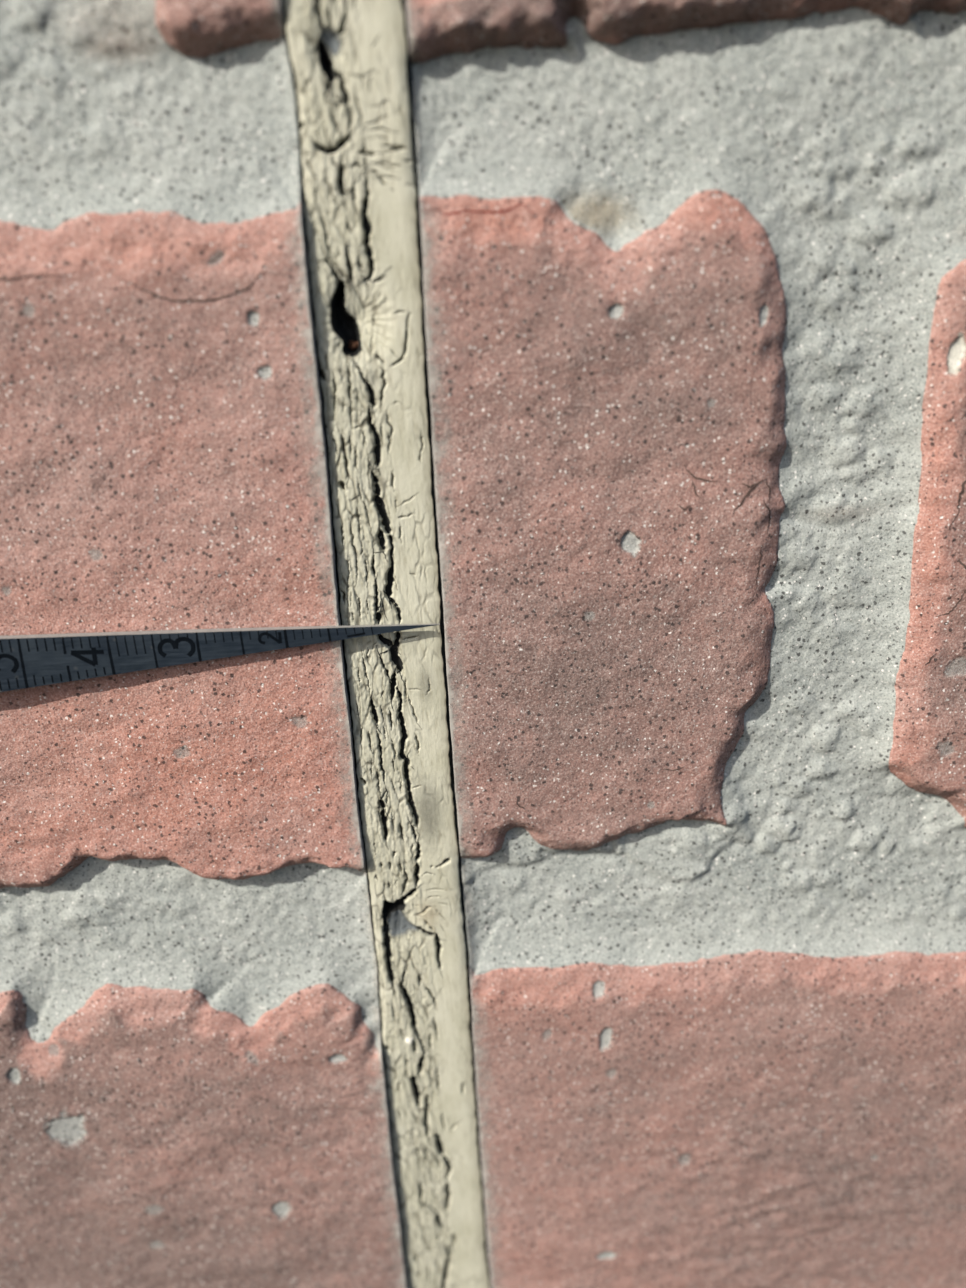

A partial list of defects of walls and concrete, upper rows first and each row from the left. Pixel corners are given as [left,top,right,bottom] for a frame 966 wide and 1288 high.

crack [116,0,535,1288]